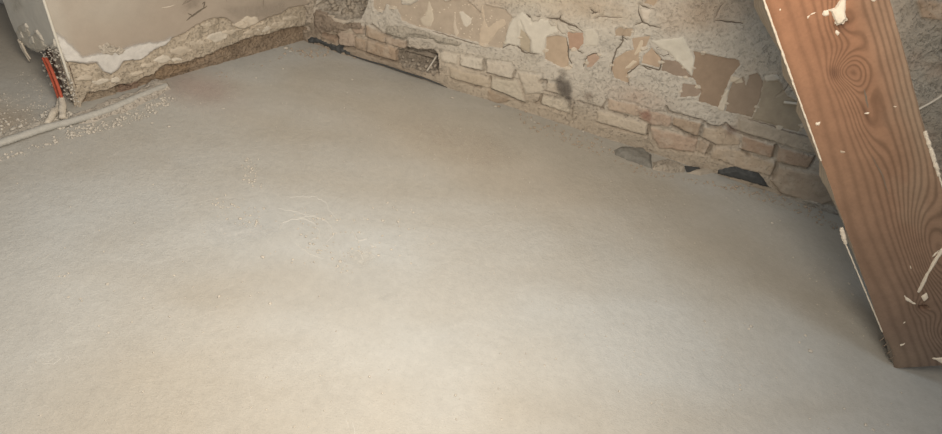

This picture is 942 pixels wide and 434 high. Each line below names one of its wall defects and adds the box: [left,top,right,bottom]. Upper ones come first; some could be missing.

crack [182,0,207,21]
flaking render [16,0,513,107]
flaking render [542,22,601,70]
crack [526,4,662,86]
flaking render [609,26,804,132]